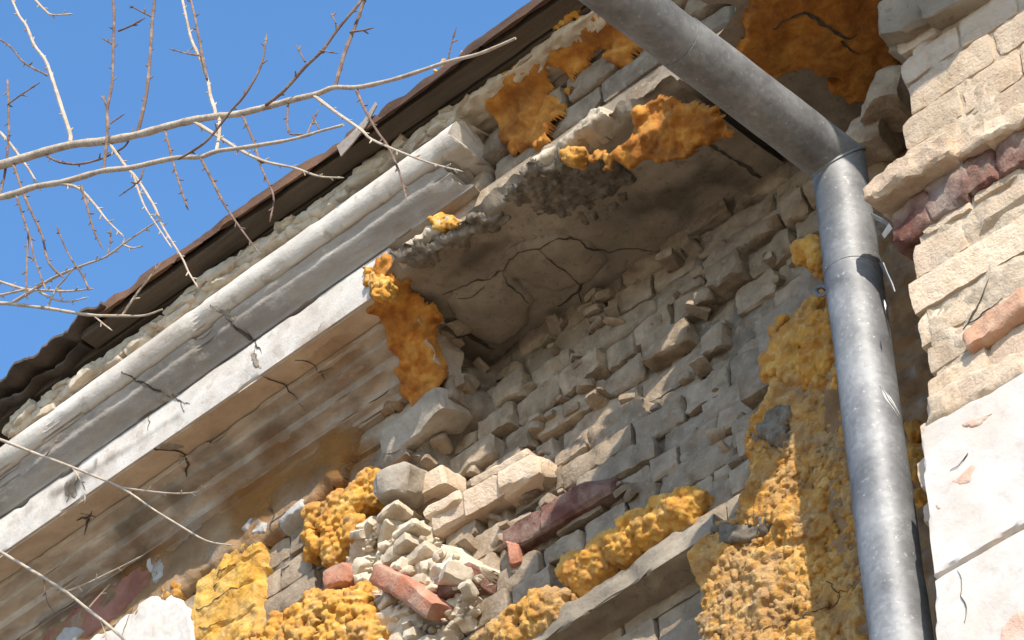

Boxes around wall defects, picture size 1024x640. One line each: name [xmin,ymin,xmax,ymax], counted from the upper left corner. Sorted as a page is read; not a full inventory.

spalling [387,147,636,269]
crack [443,236,646,307]
crack [963,280,1002,329]
crack [210,305,303,407]
crack [121,371,190,477]
crack [64,479,96,534]